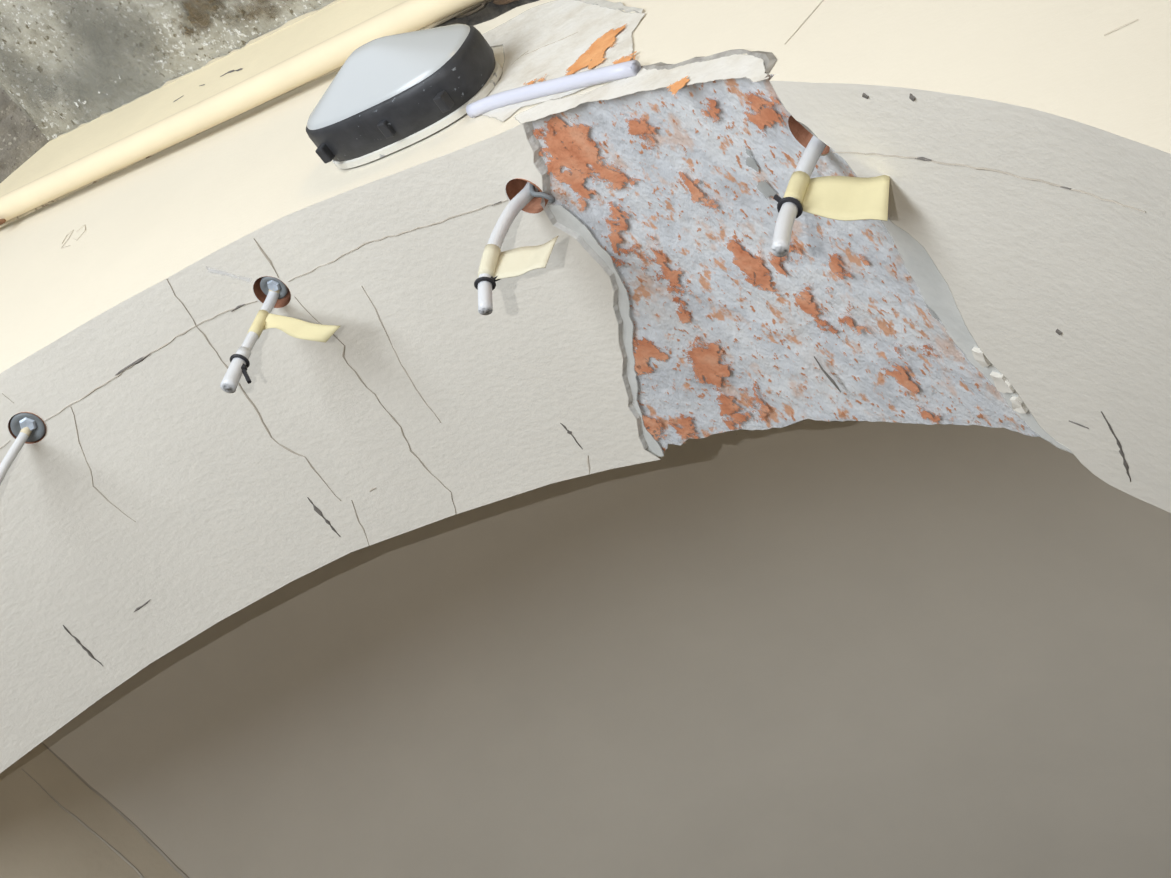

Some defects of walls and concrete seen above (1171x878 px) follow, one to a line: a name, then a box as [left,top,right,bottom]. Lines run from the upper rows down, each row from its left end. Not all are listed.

crack [45,280,370,547]
crack [254,200,507,513]
flaking render [433,0,1080,462]
crack [833,152,1145,212]